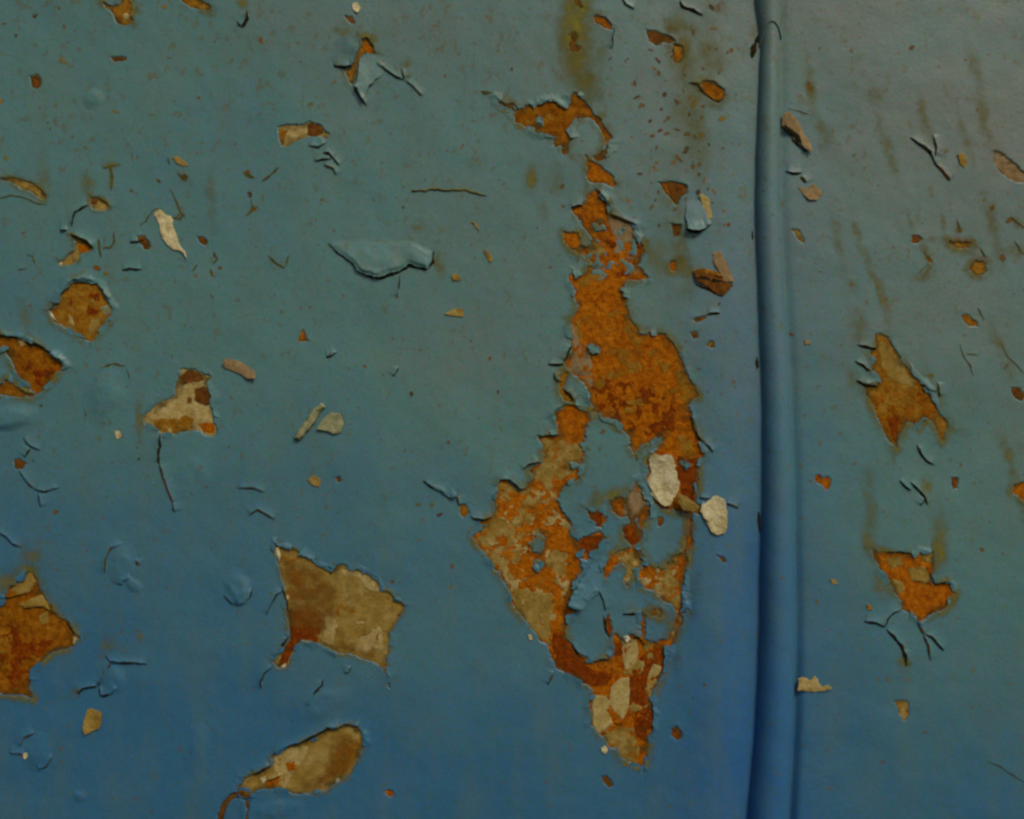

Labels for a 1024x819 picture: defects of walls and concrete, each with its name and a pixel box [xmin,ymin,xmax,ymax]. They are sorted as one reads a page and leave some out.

peeling [346,33,375,84]
peeling [278,122,330,147]
rust [637,90,730,226]
peeling [781,112,813,152]
crack [157,433,174,511]
peeling [137,358,256,439]
peeling [460,90,734,776]
peeling [266,536,405,690]
crack [864,610,944,666]
peeling [234,717,375,804]